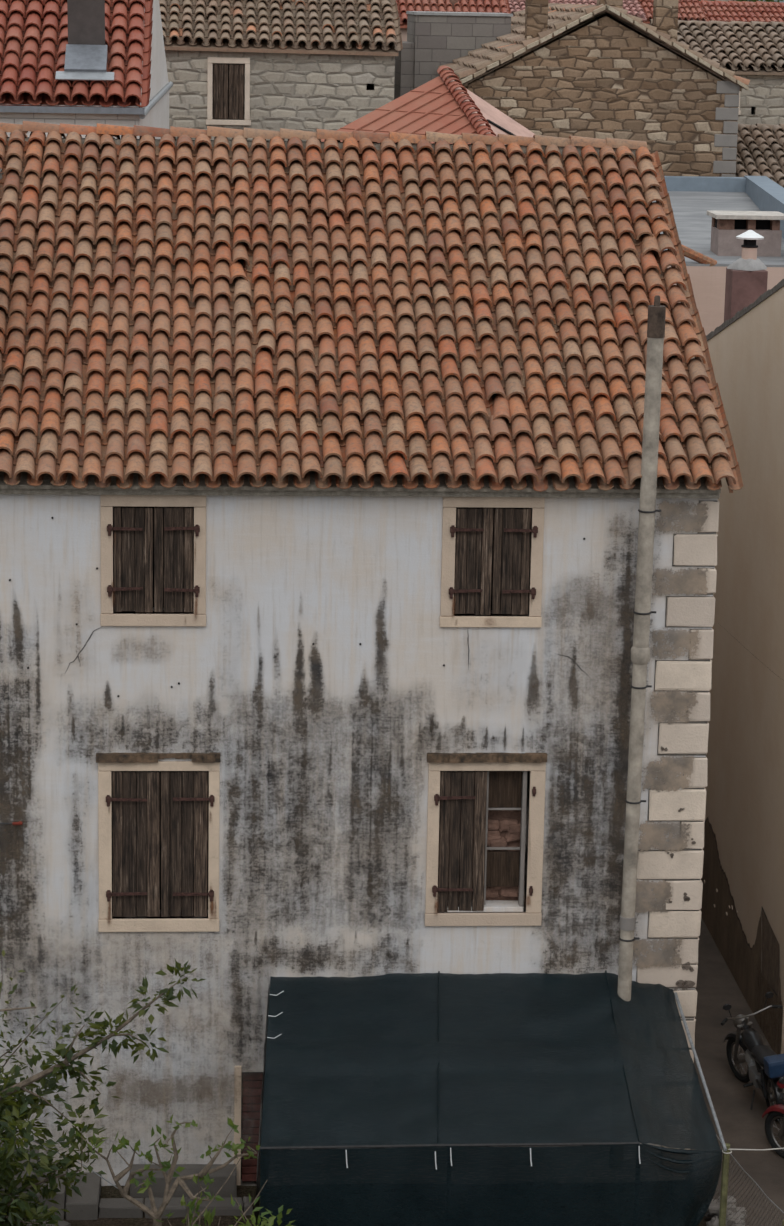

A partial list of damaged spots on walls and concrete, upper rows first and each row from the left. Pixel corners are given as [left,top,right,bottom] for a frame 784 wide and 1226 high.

leakage [0,601,45,995]
leakage [72,815,80,882]
crack [65,626,103,673]
leakage [114,677,218,753]
leakage [213,601,506,1058]
leakage [521,517,638,974]
peeling [642,746,694,792]
peeling [633,808,783,1055]